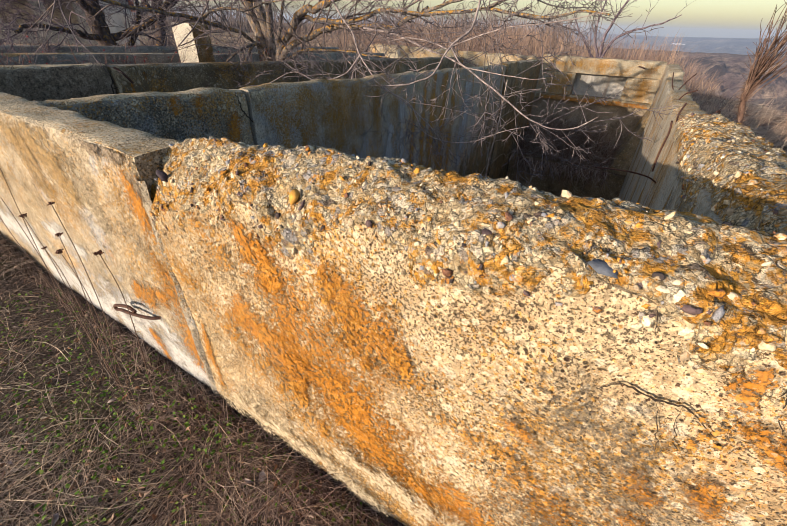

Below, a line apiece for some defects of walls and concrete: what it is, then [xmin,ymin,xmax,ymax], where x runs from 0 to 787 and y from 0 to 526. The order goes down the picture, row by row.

rust [0,117,85,212]
rust [255,83,399,156]
rust [409,72,457,171]
spalling [78,94,787,414]
rust [119,156,664,526]
crack [597,383,714,457]
rust [643,368,787,476]
rust [681,477,738,525]